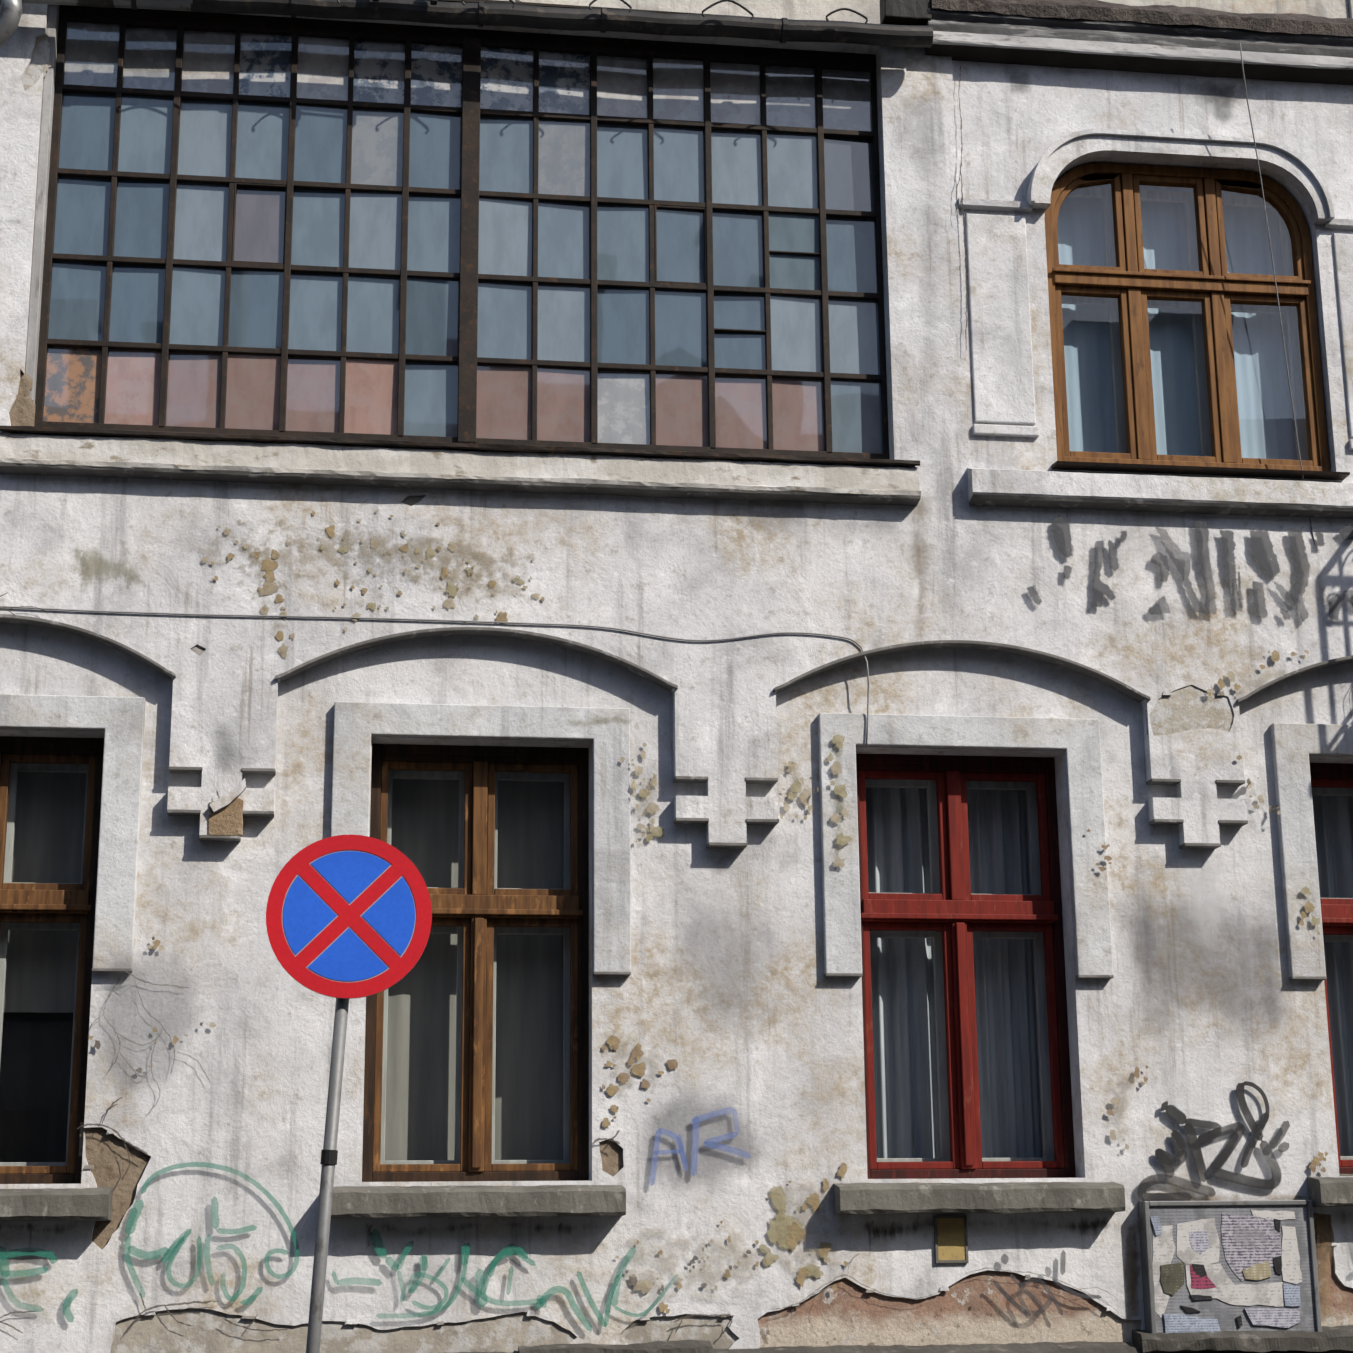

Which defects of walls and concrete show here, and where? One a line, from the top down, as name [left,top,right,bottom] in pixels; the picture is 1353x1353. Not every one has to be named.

flaking render [9,371,36,426]
flaking render [375,496,425,518]
peeling [202,525,295,658]
peeling [318,525,476,632]
flaking render [1145,671,1241,736]
flaking render [208,778,246,837]
crack [77,971,210,1181]
peeling [599,1035,678,1176]
flaking render [79,1122,151,1250]
flaking render [615,1163,1141,1349]
flaking render [1313,1213,1353,1327]
flaking render [110,1308,577,1353]